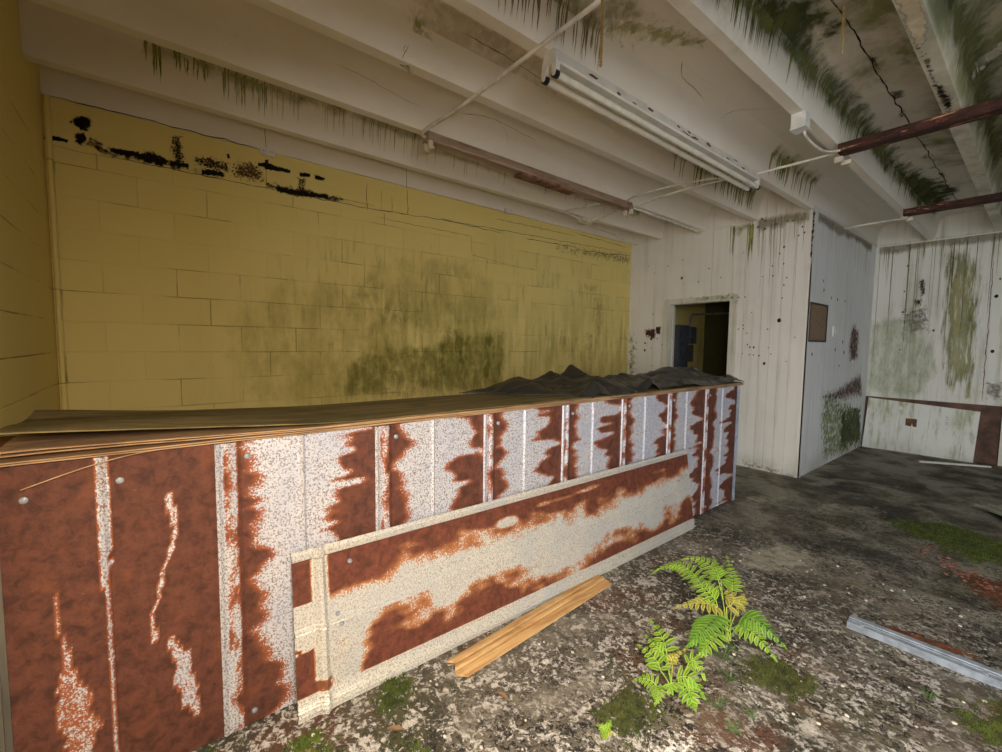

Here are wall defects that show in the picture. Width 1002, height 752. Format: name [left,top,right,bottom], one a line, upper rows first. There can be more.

damp [144,40,162,77]
damp [173,50,304,115]
damp [498,0,639,64]
damp [731,0,880,139]
crack [830,0,963,210]
damp [947,0,1002,105]
damp [44,116,343,201]
damp [674,153,755,208]
damp [769,149,817,198]
damp [873,144,924,207]
damp [730,212,807,259]
damp [818,214,1002,338]